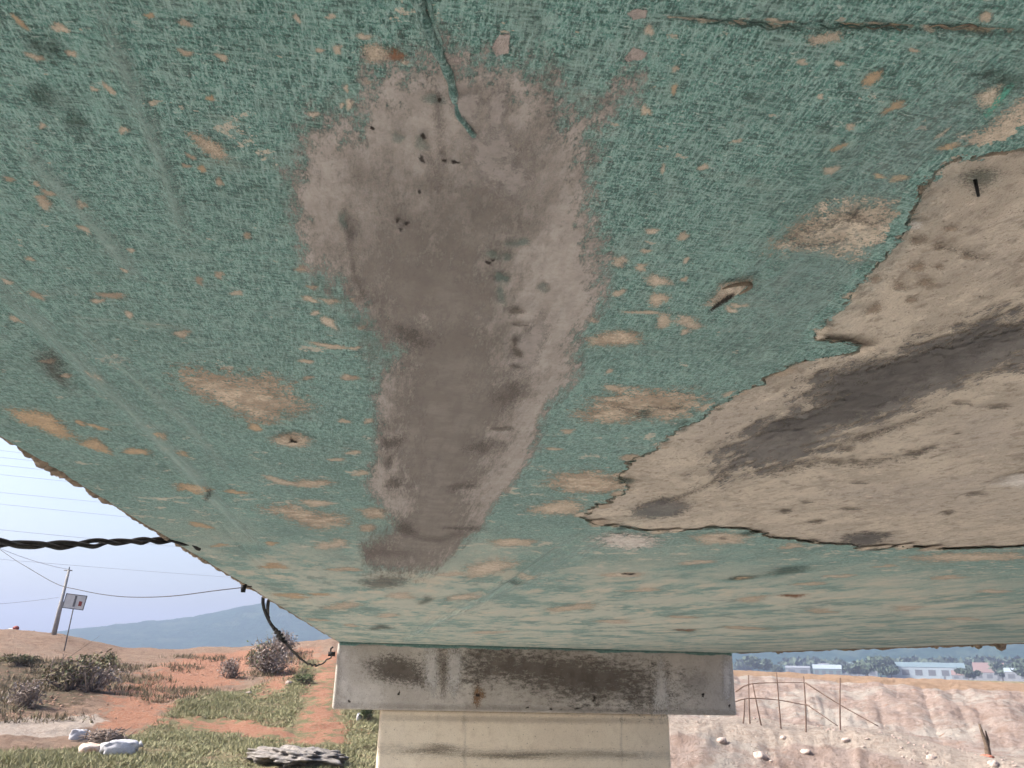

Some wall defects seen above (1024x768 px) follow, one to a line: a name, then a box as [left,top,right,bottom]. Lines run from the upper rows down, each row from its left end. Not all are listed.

peeling [293,263,359,330]
damp [325,108,555,577]
spalling [524,83,1024,580]
peeling [0,405,152,456]
peeling [161,357,323,450]
damp [364,648,682,719]